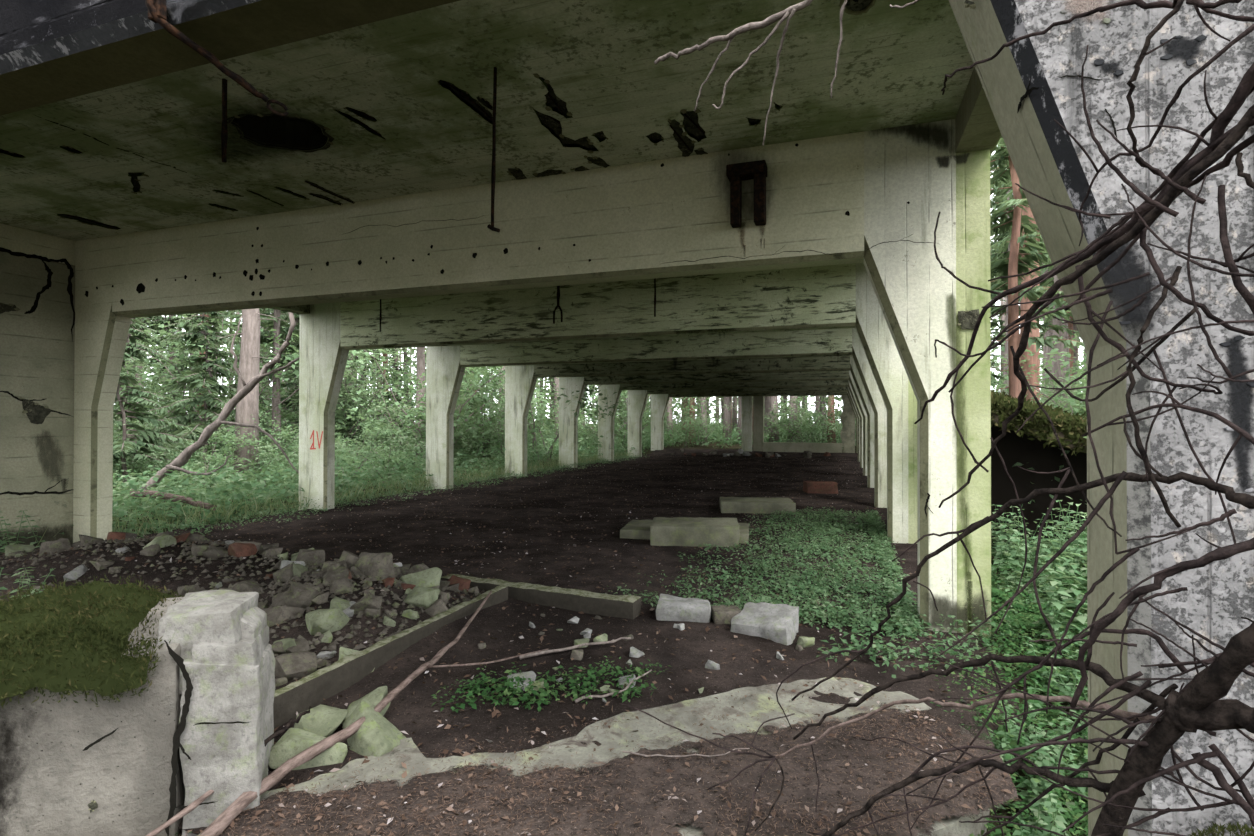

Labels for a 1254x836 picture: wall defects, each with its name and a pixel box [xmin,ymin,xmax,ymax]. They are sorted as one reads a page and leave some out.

spalling [335,107,386,141]
spalling [438,80,493,121]
spalling [507,73,611,180]
spalling [649,109,708,157]
crack [0,247,75,342]
crack [0,391,73,417]
leakage [37,432,68,493]
crack [0,480,74,495]
crack [164,640,249,836]